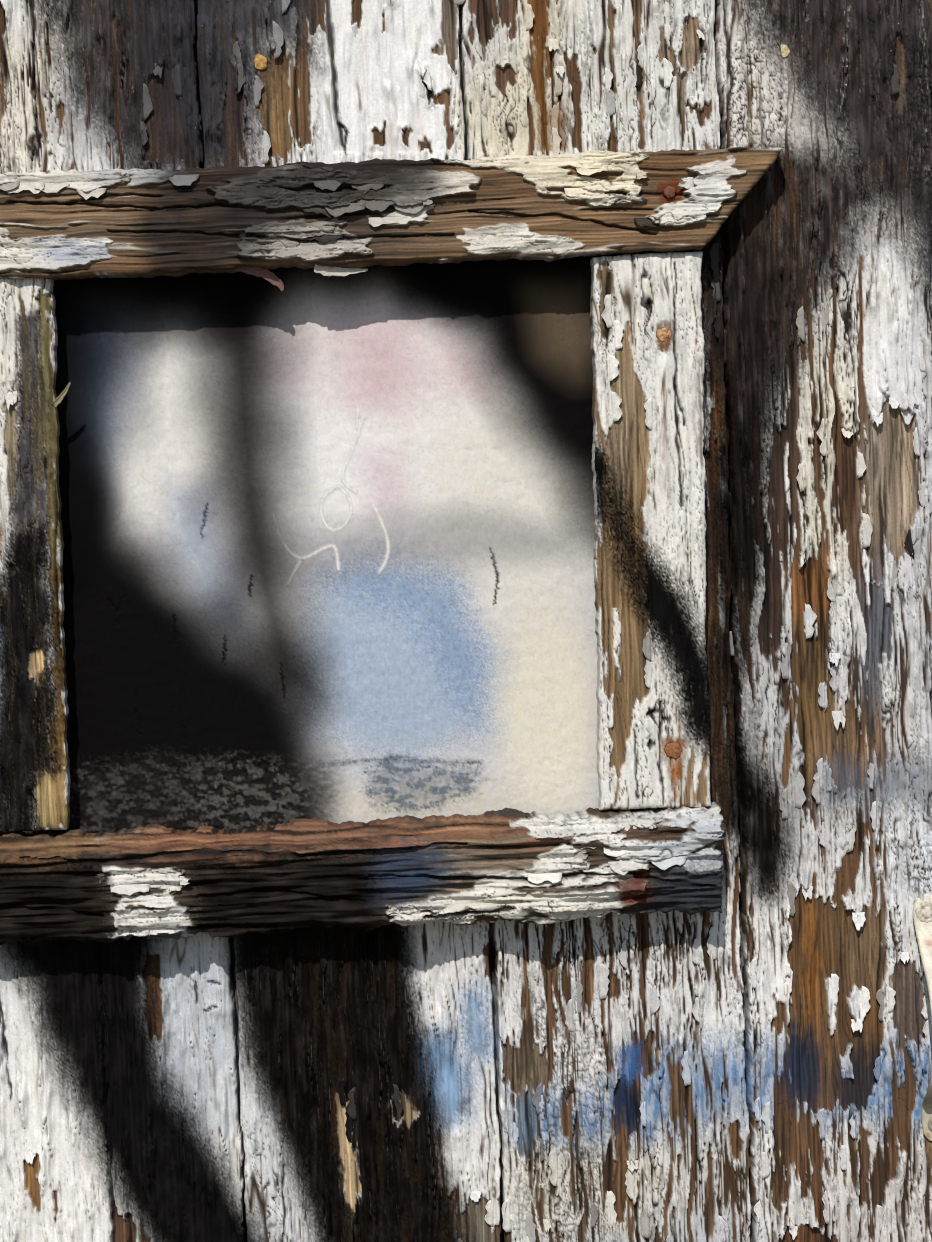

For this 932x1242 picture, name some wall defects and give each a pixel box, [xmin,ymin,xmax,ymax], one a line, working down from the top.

peeling [0,0,13,106]
peeling [0,42,200,279]
peeling [212,0,783,324]
corrosion [658,180,683,203]
corrosion [662,737,685,800]